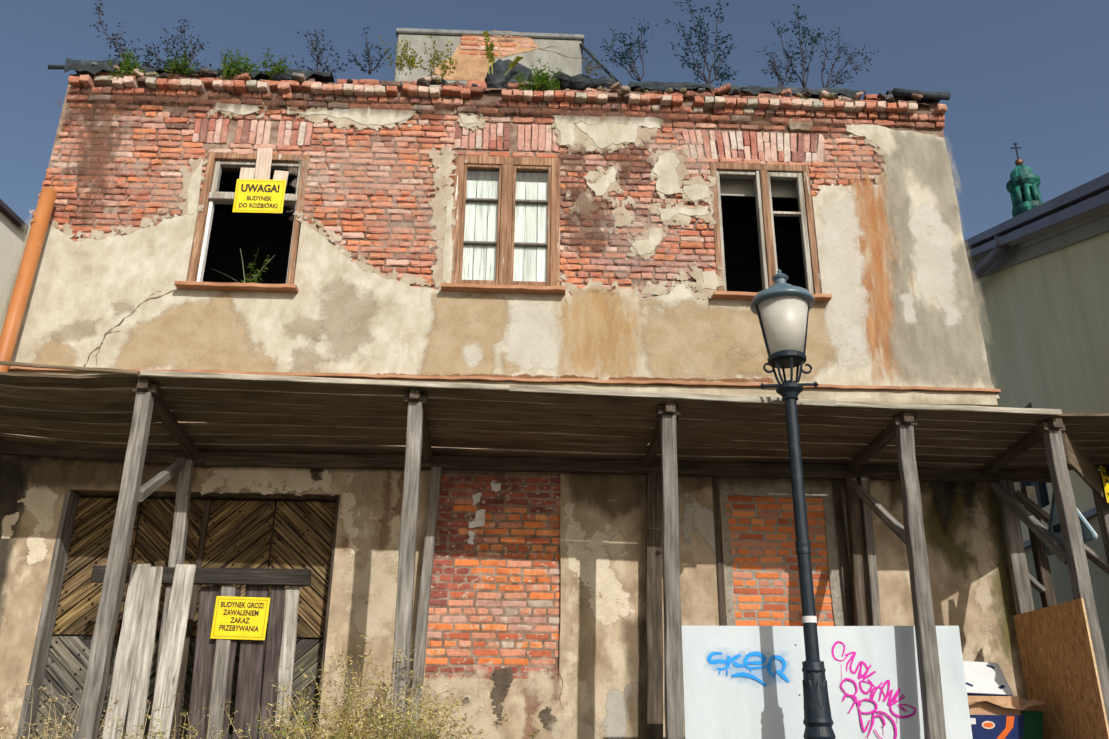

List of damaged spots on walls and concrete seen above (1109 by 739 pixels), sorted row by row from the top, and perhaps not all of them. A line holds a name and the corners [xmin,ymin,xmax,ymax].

flaking render [434,30,539,80]
flaking render [30,97,889,370]
corrosion [851,173,899,372]
crack [84,290,175,367]
damp [140,463,178,486]
peeling [1,484,59,565]
damp [0,455,124,603]
damp [523,688,540,739]